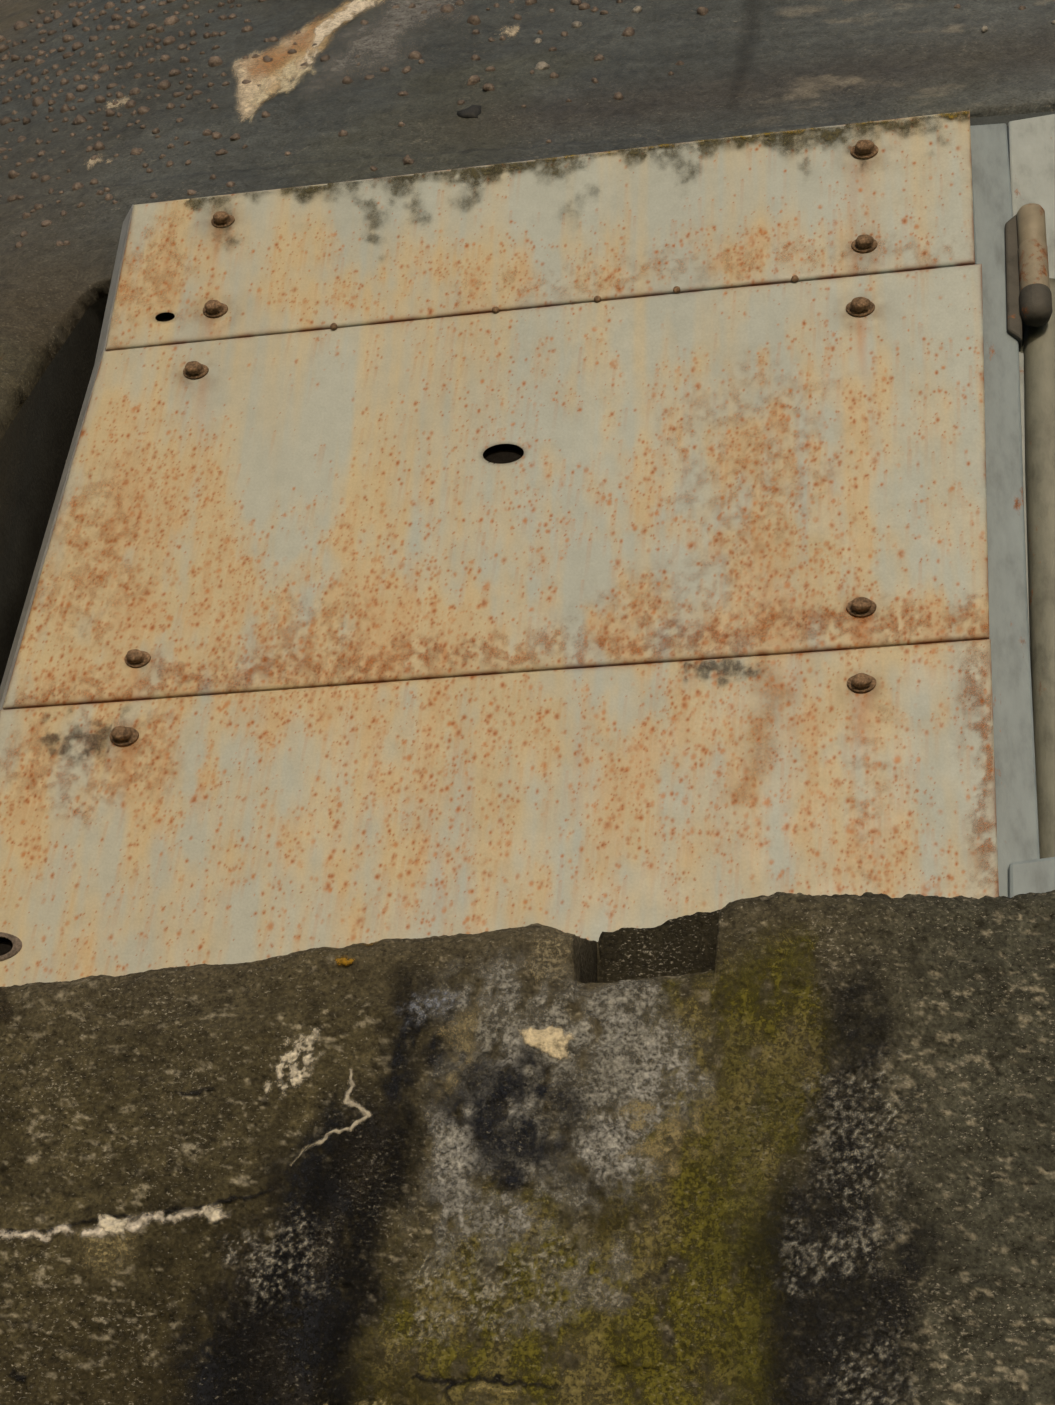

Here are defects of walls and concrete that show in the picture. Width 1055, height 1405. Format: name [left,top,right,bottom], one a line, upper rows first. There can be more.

spalling [234,0,381,120]
crack [0,1069,371,1271]
damp [170,972,462,1405]
damp [413,1242,586,1328]
damp [730,975,935,1405]